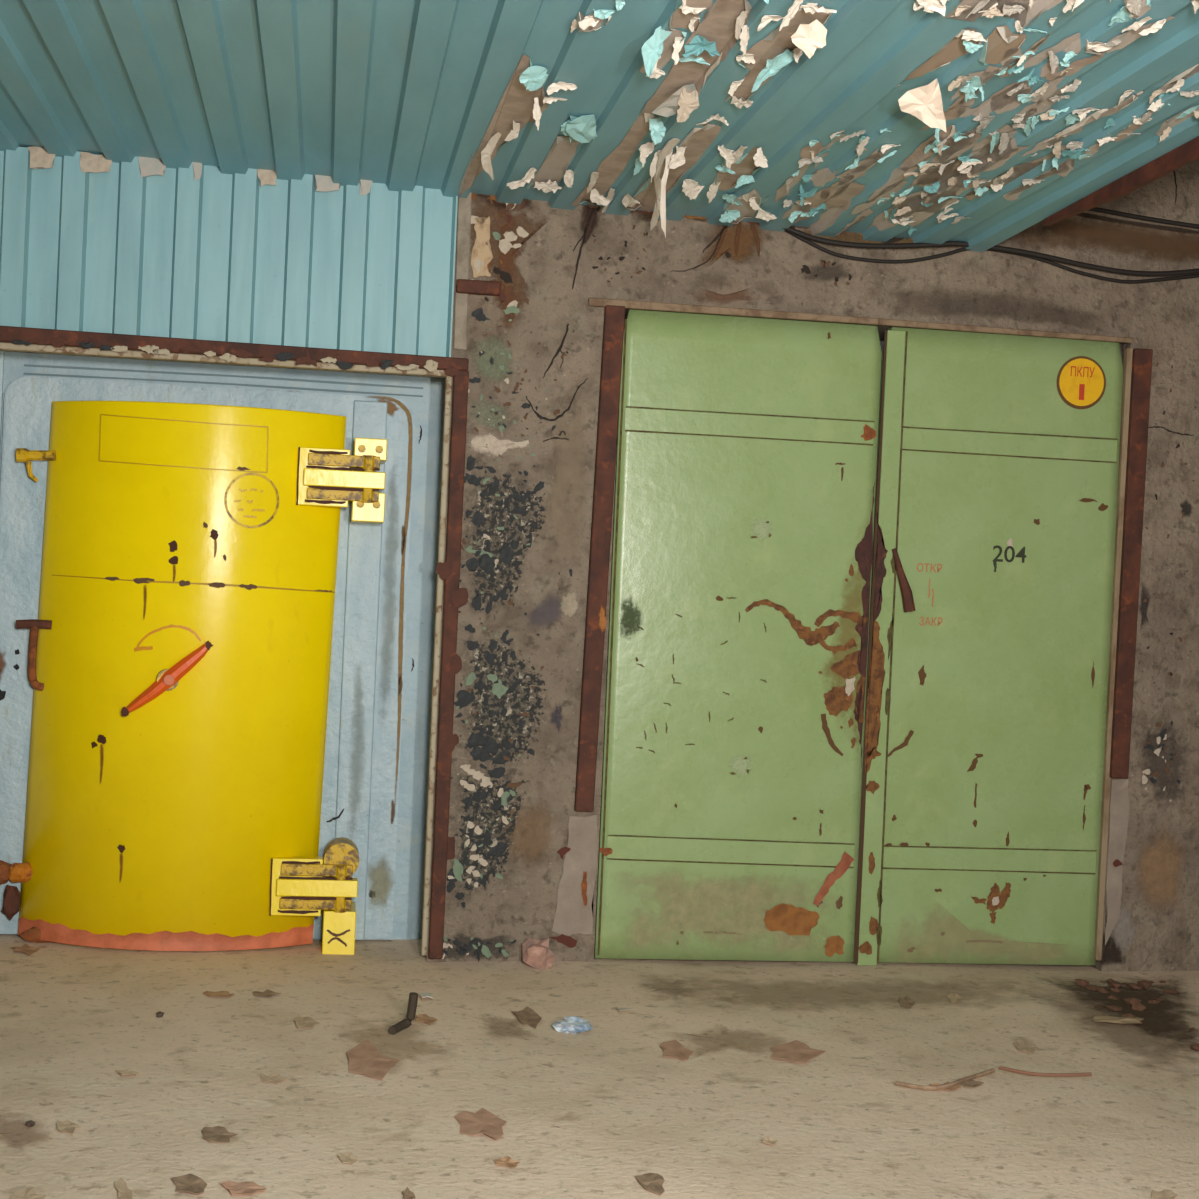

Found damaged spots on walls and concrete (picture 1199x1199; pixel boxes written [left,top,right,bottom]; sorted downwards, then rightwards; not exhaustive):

peeling [458,0,1199,282]
spalling [801,260,852,286]
rust [12,336,460,377]
rust [296,447,380,505]
rust [168,540,190,586]
rust [203,522,226,561]
rust [208,582,257,590]
rust [371,396,412,824]
water stain [531,599,561,625]
rust [745,484,914,794]
rust [269,858,352,916]
rust [764,852,854,936]